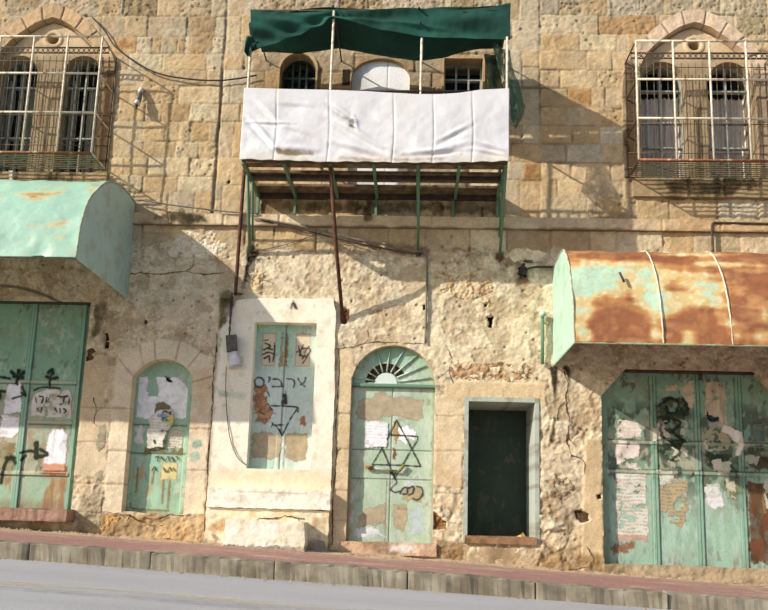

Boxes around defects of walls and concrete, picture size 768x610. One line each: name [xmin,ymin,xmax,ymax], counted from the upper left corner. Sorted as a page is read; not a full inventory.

damp [664,176,757,196]
flaking render [162,230,228,260]
crack [131,263,223,275]
flaking render [449,362,536,382]
crack [557,371,586,473]
corrosion [746,456,768,471]
corrosion [746,482,768,564]